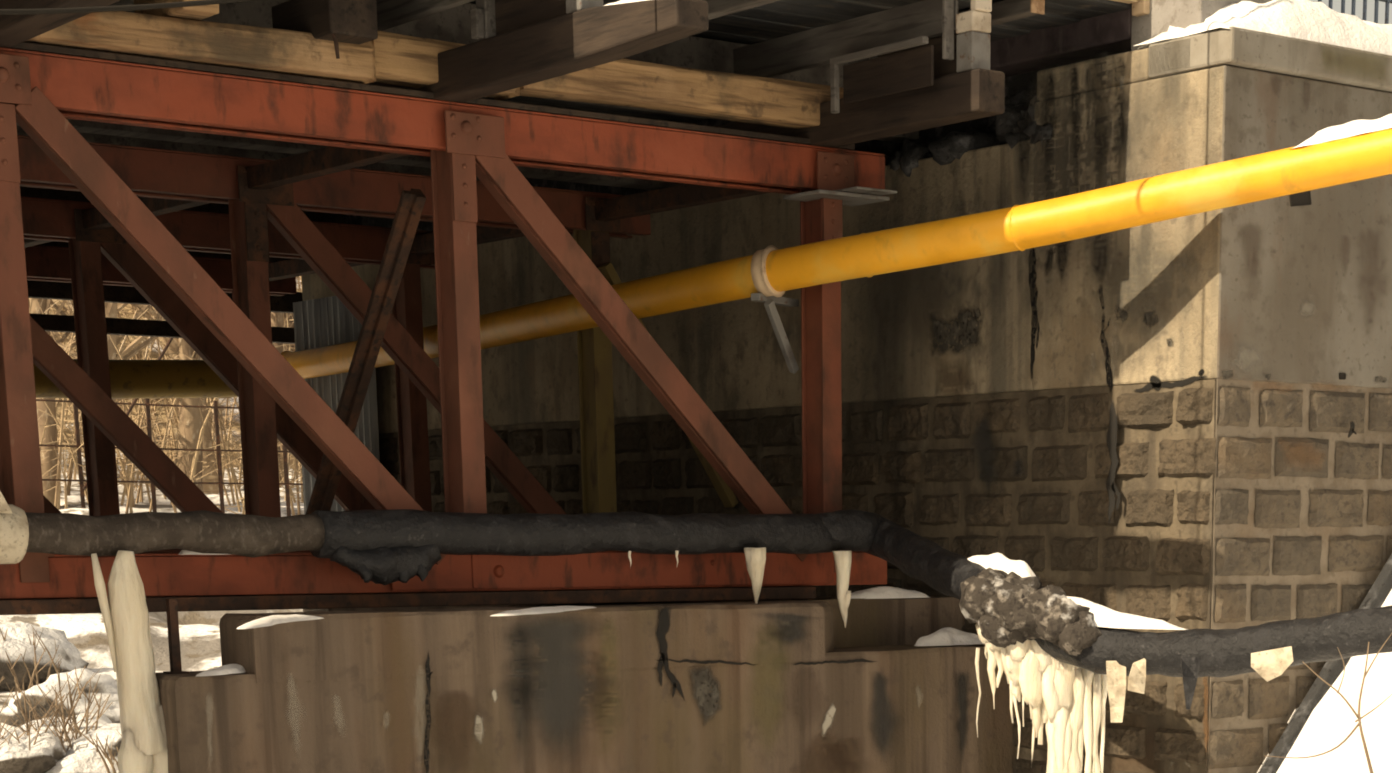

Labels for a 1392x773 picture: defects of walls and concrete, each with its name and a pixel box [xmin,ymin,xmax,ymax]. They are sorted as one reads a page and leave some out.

damp [1020,52,1139,201]
crack [1029,248,1040,379]
damp [1045,241,1067,278]
damp [1093,232,1110,279]
crack [1099,285,1205,522]
damp [475,715,483,740]
damp [492,619,593,744]
crack [656,606,684,699]